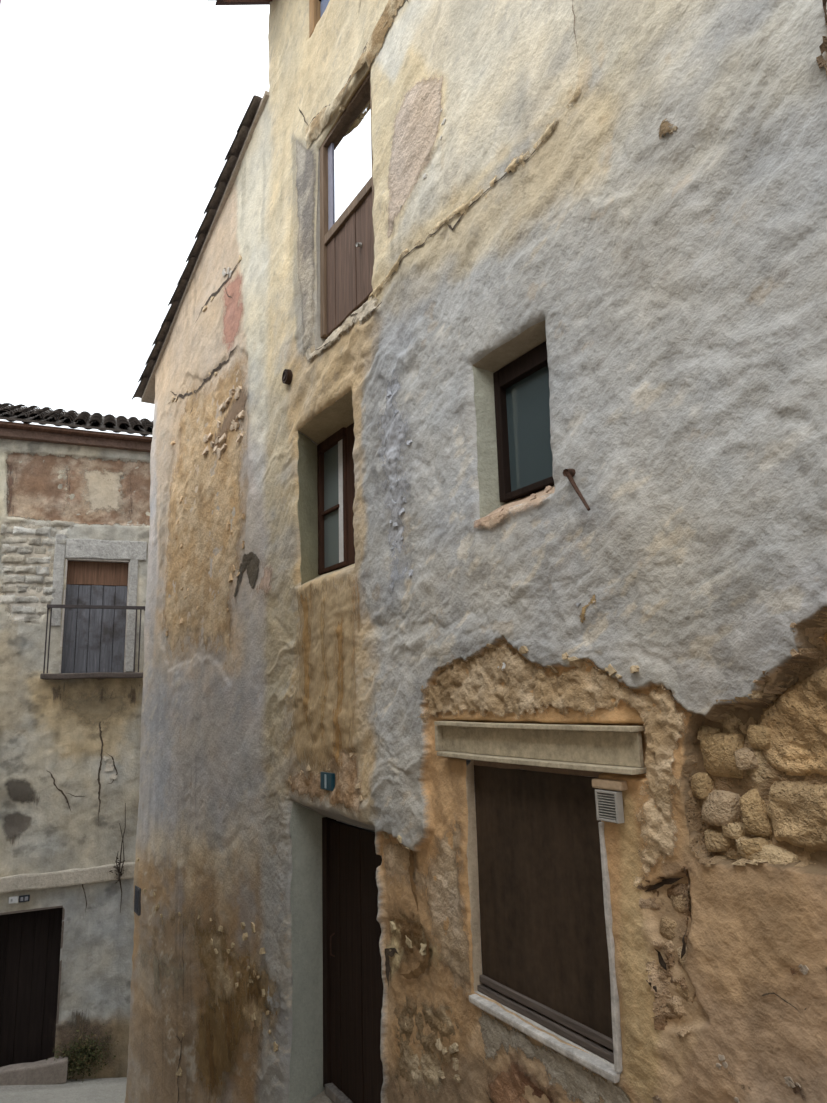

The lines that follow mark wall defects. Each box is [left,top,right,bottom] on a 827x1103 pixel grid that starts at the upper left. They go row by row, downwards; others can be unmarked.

spalling [659,118,678,138]
crack [368,88,580,301]
peeling [222,267,243,348]
crack [168,346,237,413]
peeling [162,363,246,653]
crack [48,722,118,826]
spalling [417,607,827,1038]
peeling [381,822,471,994]
water stain [196,980,261,1099]
spalling [395,997,461,1094]
flaking render [485,1060,554,1103]